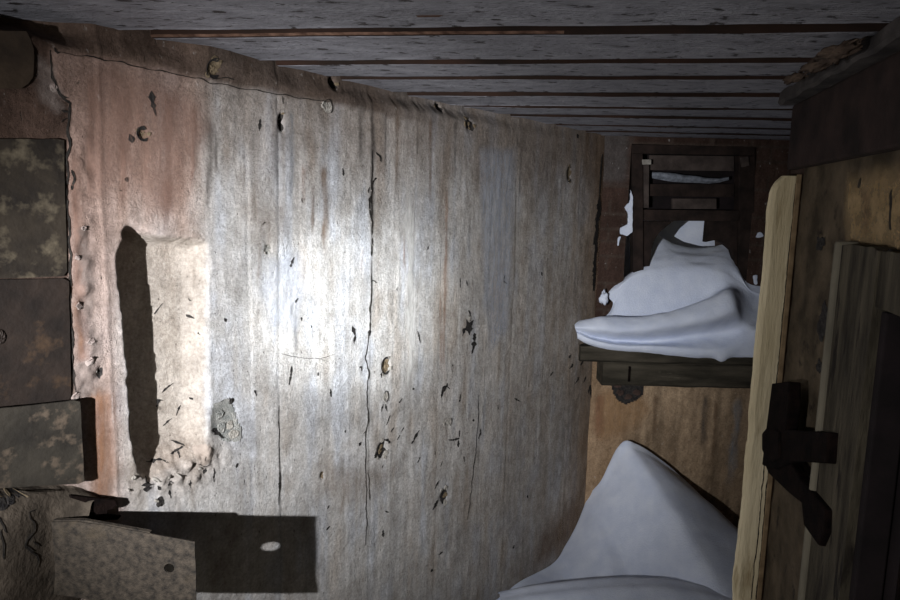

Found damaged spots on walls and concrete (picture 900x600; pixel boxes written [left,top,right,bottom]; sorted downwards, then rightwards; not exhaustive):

spalling [205,55,222,80]
spalling [128,126,151,143]
crack [592,154,603,291]
crack [363,150,382,545]
spalling [380,356,392,378]
spalling [462,310,477,354]
spalling [146,440,184,463]
spalling [211,398,241,442]
spalling [374,391,404,468]
spalling [127,473,192,508]